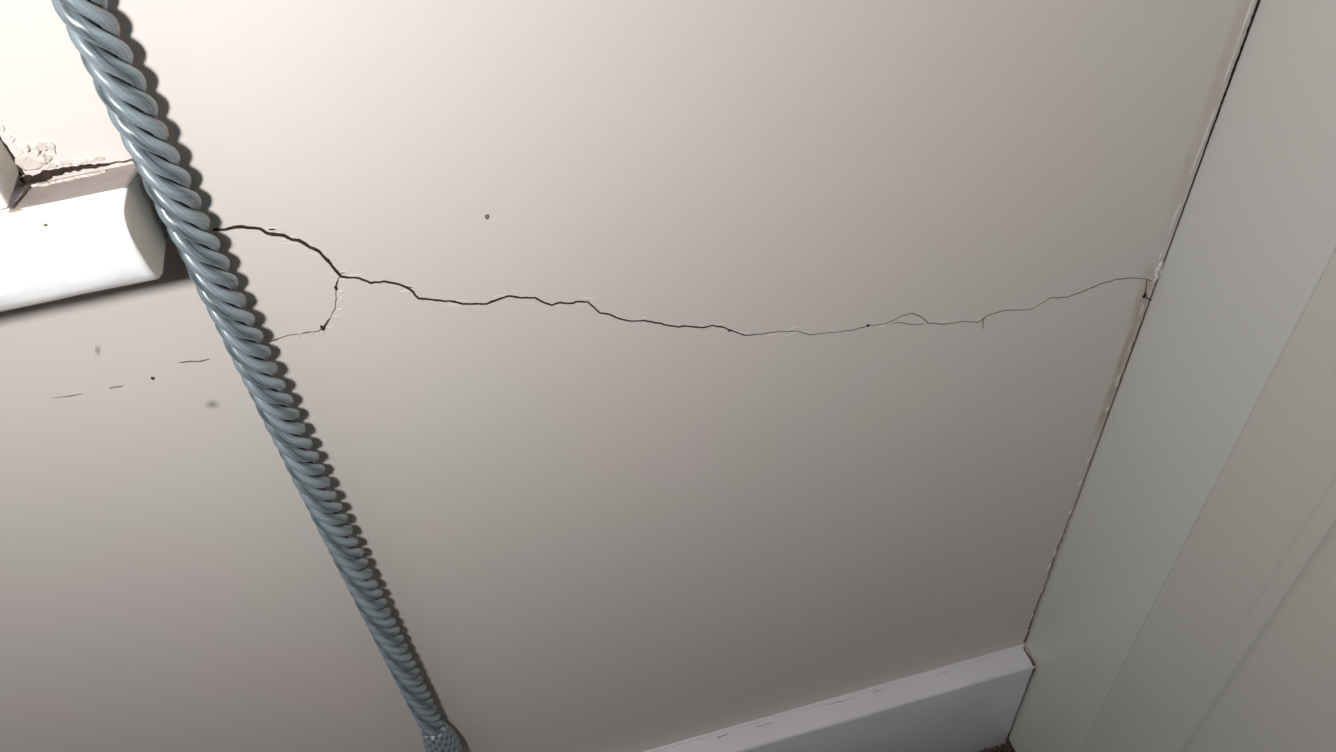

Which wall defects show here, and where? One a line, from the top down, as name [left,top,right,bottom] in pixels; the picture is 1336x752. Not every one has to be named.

crack [0,124,133,209]
crack [213,0,1261,740]